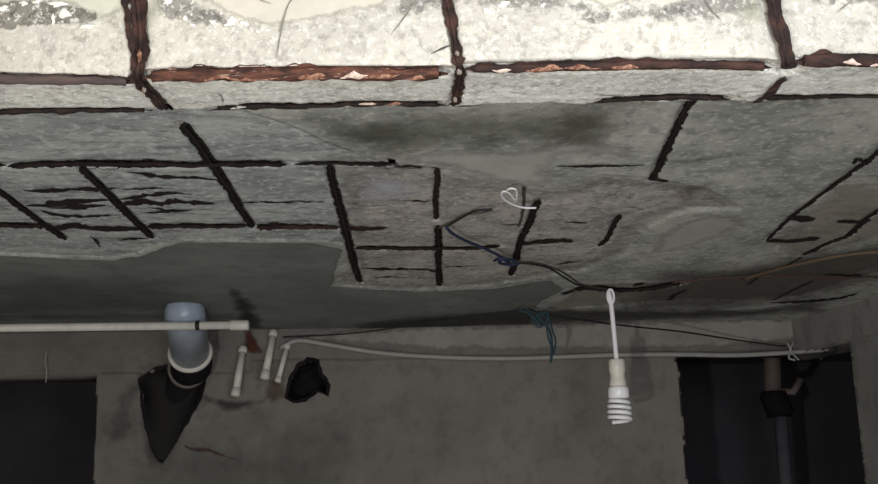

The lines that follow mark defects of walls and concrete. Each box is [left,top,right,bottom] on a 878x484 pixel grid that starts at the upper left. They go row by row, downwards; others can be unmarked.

crack [261,0,292,58]
spalling [0,0,878,286]
damp [345,116,599,145]
spalling [549,282,688,308]